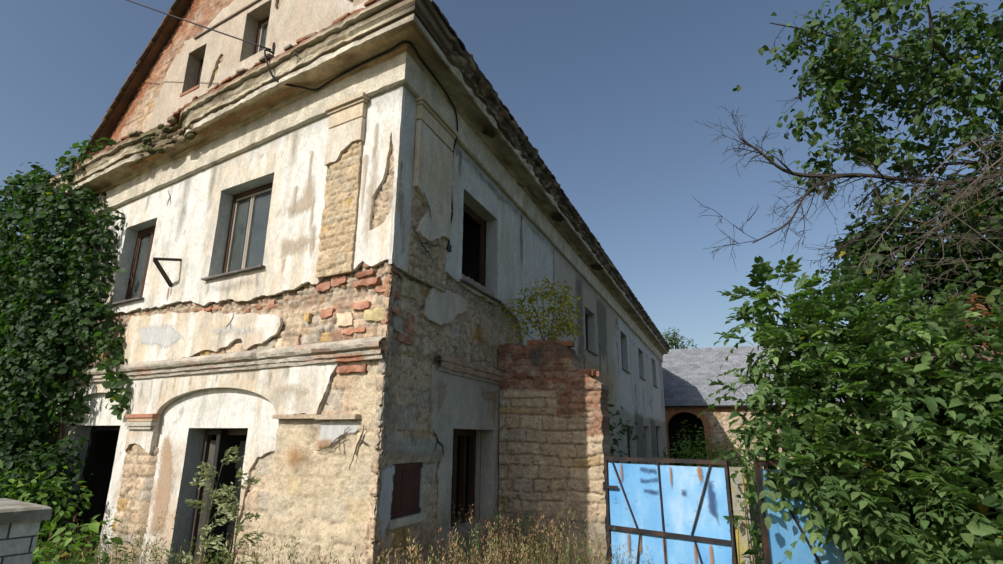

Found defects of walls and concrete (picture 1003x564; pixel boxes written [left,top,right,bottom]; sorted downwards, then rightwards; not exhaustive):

flaking render [103,0,234,164]
flaking render [69,124,521,564]